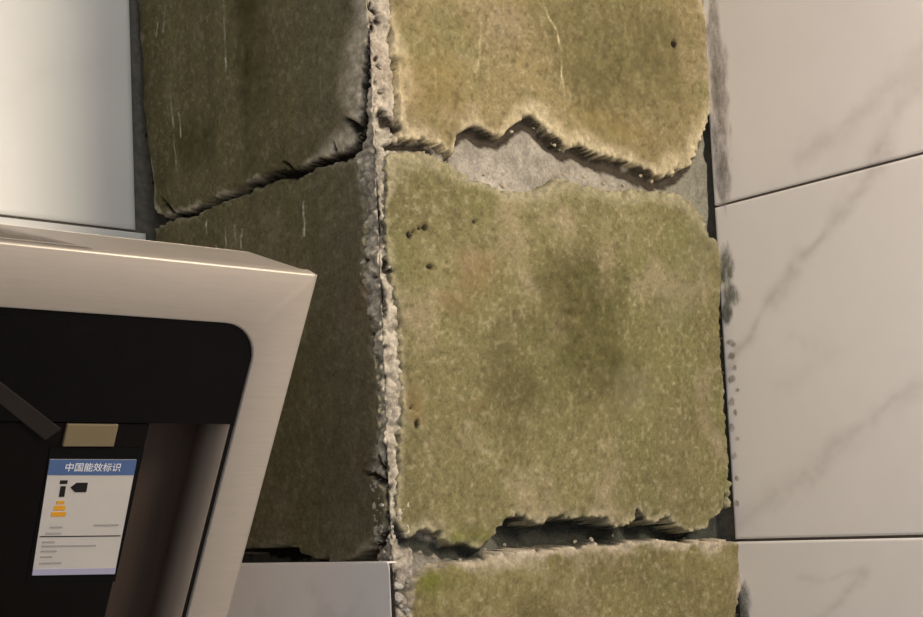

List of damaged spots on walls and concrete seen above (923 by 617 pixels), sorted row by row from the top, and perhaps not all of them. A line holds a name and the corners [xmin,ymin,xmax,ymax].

crack [152,31,699,222]
spalling [376,110,709,237]
crack [375,172,393,317]
crack [244,547,329,562]
crack [368,446,688,560]